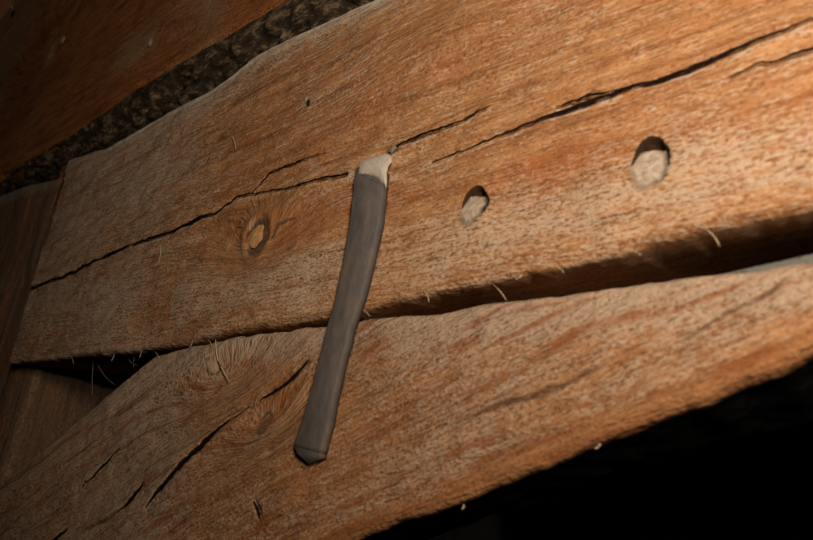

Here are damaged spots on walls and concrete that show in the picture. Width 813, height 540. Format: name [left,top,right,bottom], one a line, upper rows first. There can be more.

crack [393,105,491,147]
crack [431,17,813,163]
crack [31,152,349,289]
crack [82,447,120,487]
crack [117,360,308,512]